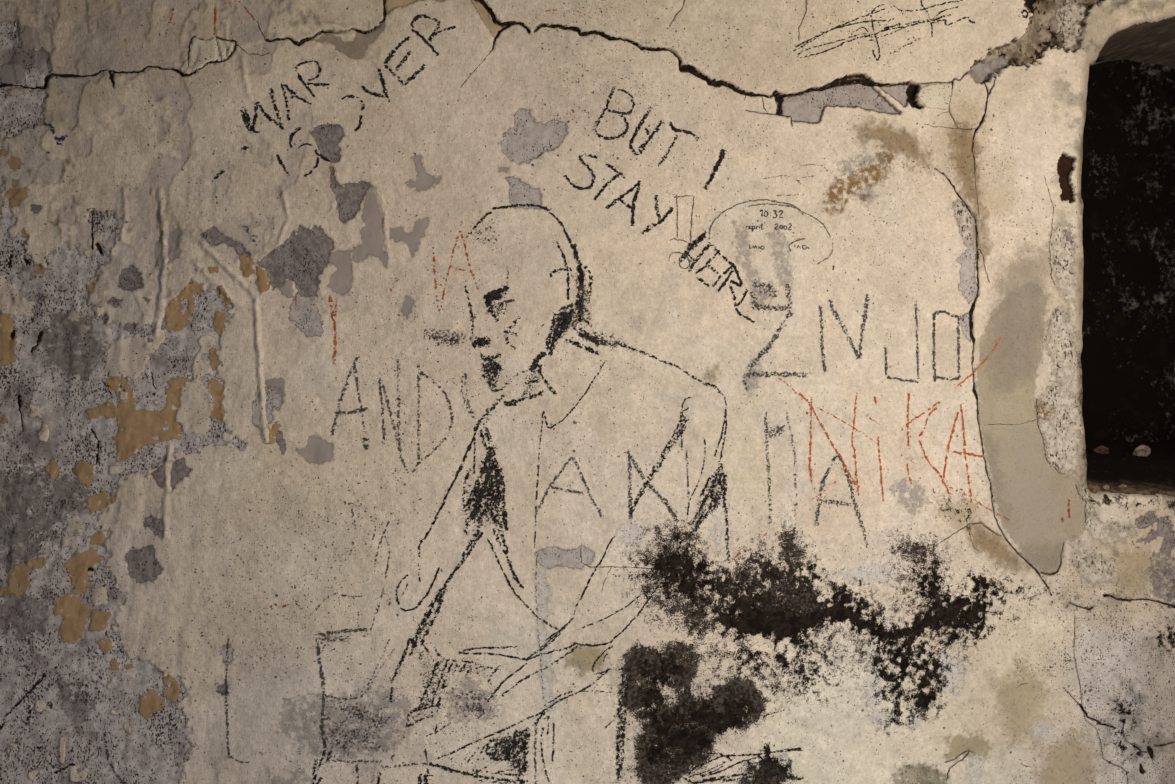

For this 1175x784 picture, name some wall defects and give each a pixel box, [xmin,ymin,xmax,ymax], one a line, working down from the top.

crack [0,0,386,89]
spalling [966,0,1103,84]
spalling [775,82,953,124]
peeling [498,108,568,210]
crack [92,212,102,254]
peeling [200,124,428,337]
crack [10,330,43,352]
crack [91,428,100,464]
peeling [0,20,334,784]
crack [461,0,1175,780]
spalling [1069,485,1175,608]
water stain [566,489,1051,784]